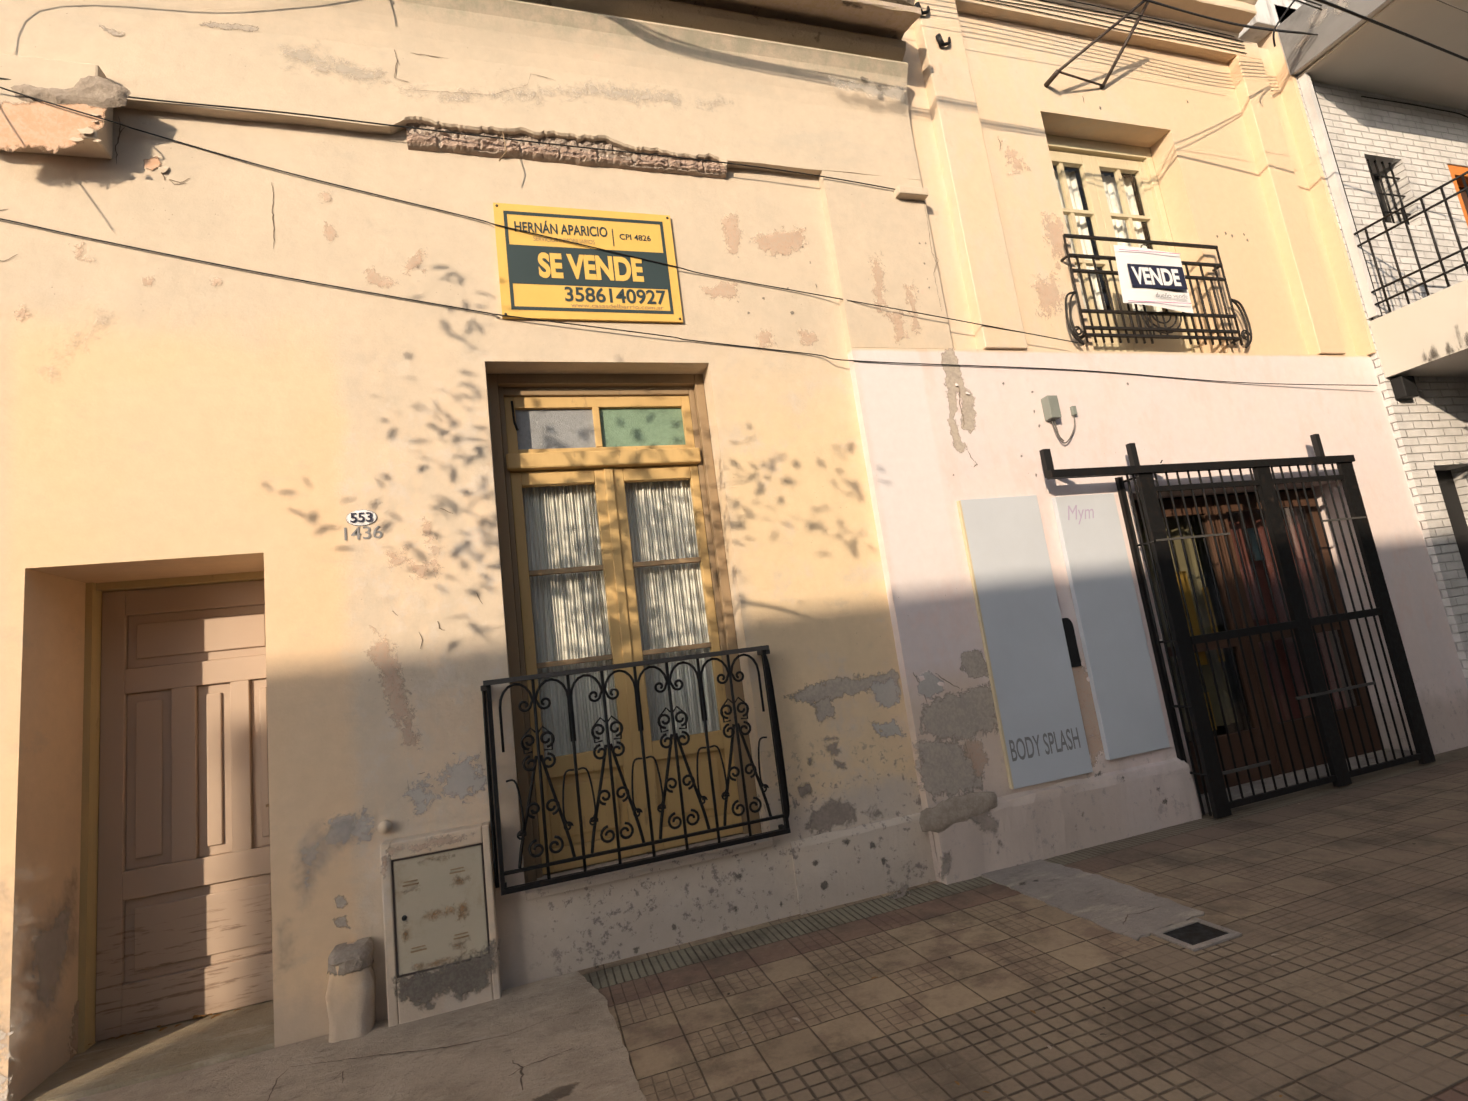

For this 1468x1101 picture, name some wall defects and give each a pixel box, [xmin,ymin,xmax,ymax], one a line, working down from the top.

peeling [0,75,131,153]
spalling [406,123,727,178]
peeling [941,349,976,453]
peeling [784,650,999,833]
leakage [393,940,499,1010]
peeling [0,1031,12,1101]